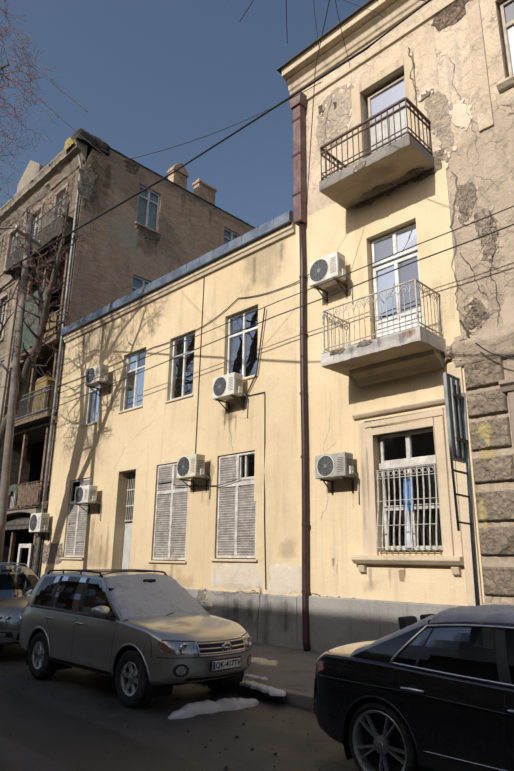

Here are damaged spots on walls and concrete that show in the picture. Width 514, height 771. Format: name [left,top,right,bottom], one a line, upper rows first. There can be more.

flaking render [431,0,473,32]
flaking render [316,80,356,159]
flaking render [77,164,98,208]
spalling [123,158,140,175]
flaking render [352,86,473,210]
spalling [135,225,162,242]
flaking render [453,182,503,268]
flaking render [462,297,514,330]